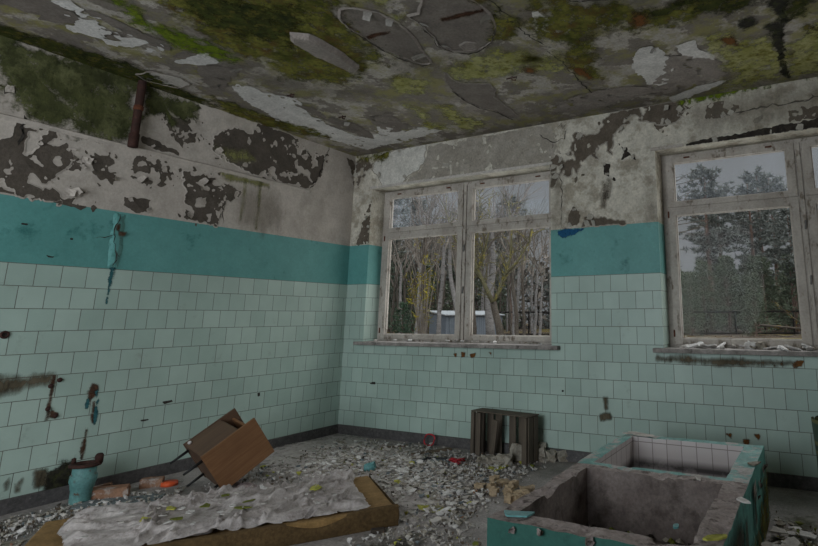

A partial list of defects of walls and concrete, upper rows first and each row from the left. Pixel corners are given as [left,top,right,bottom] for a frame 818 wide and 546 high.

peeling [289,32,360,73]
water stain [737,0,792,78]
peeling [705,101,739,119]
peeling [788,106,818,131]
peeling [0,122,120,212]
peeling [124,113,329,228]
peeling [347,99,693,189]
peeling [356,204,371,246]
peeling [568,206,627,228]
rust [45,375,57,421]